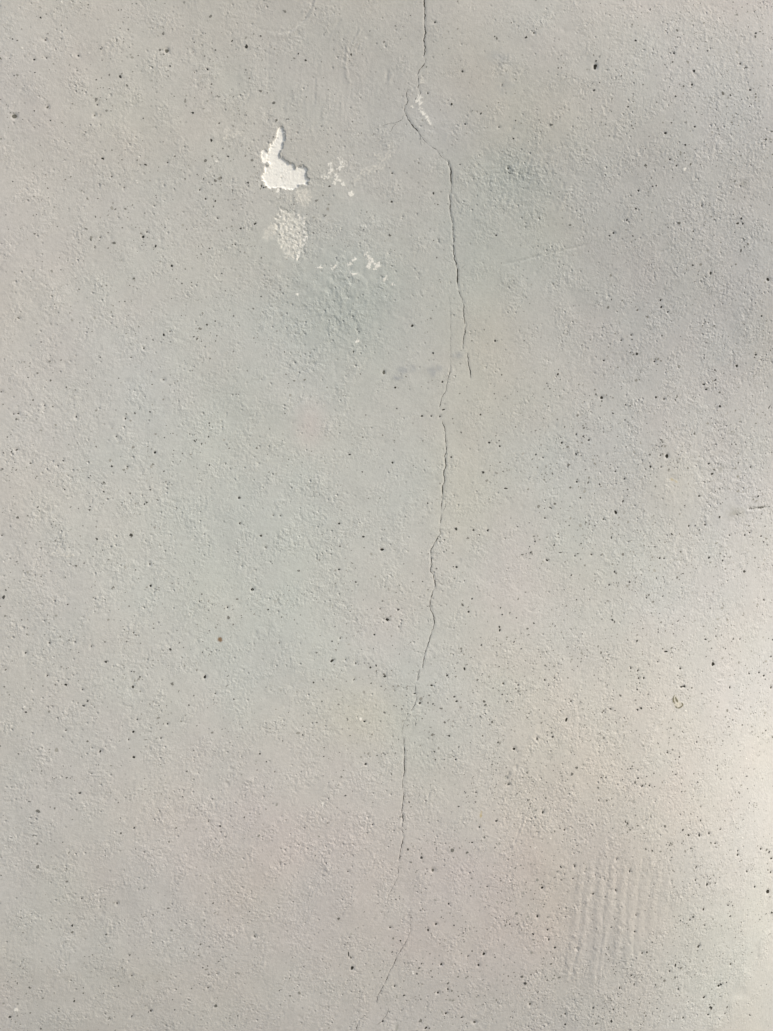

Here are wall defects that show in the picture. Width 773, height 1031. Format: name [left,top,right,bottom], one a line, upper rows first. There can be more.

peeling [258,126,355,261]